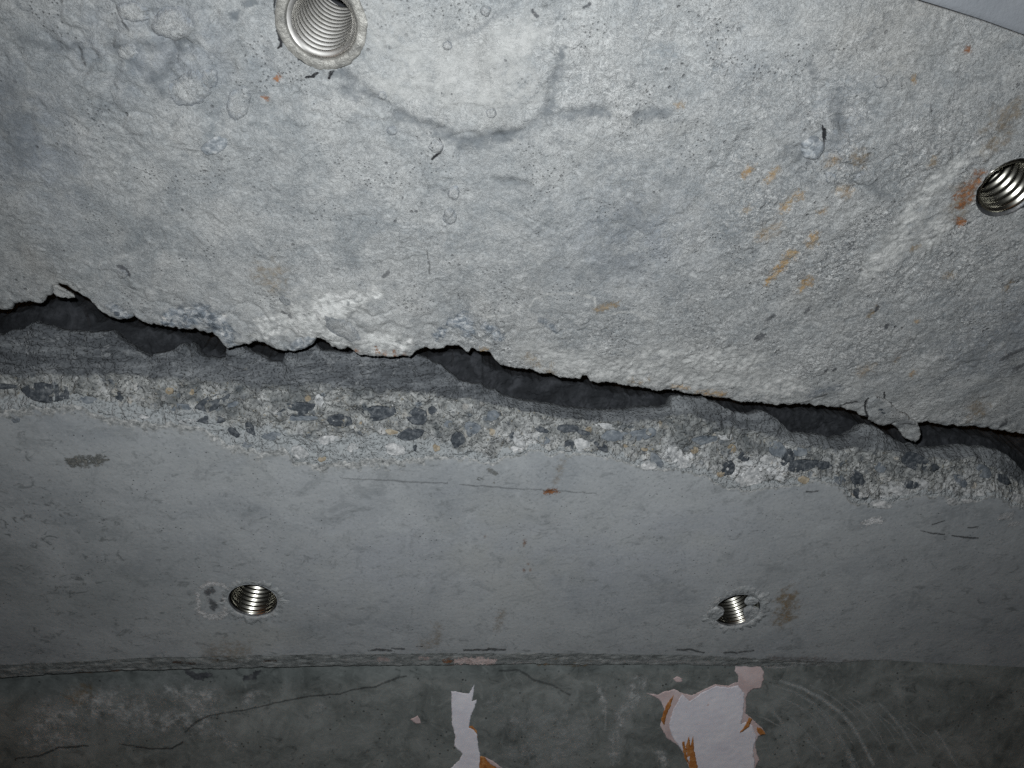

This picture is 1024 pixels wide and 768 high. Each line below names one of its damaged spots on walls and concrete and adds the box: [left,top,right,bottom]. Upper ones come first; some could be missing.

rust [954,170,985,225]
crack [0,283,286,361]
crack [315,338,354,352]
spalling [0,302,1024,528]
crack [414,345,1024,471]
peeling [451,686,502,768]
peeling [647,666,765,768]